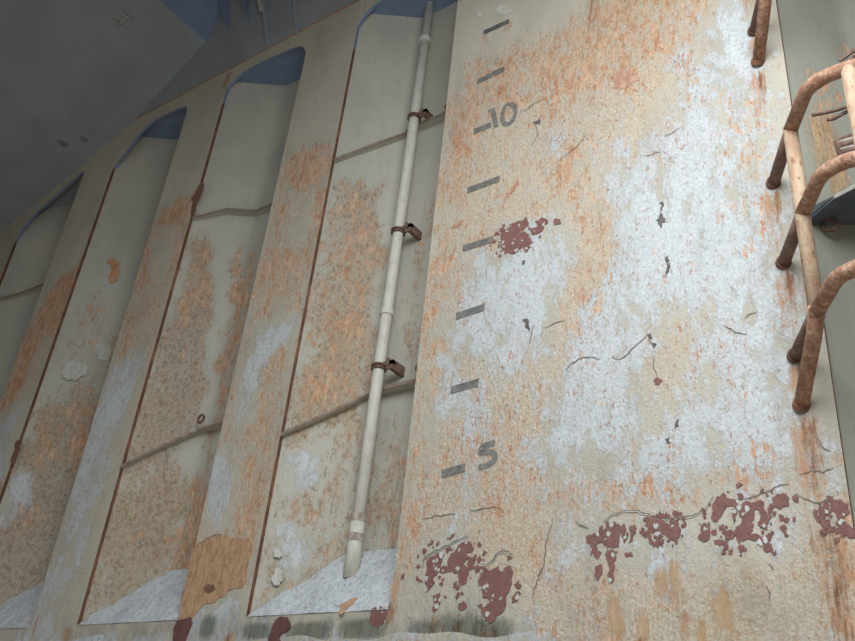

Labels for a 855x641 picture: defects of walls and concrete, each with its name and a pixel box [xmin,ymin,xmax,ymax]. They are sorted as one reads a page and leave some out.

corrosion [753,73,766,111]
peeling [489,217,561,265]
corrosion [107,258,121,283]
crack [565,335,658,377]
corrosion [10,439,23,465]
peeling [698,482,799,557]
peeling [813,495,855,544]
peeling [586,510,687,583]
peeling [173,534,253,641]
peeling [416,533,522,623]
peeling [369,606,388,629]